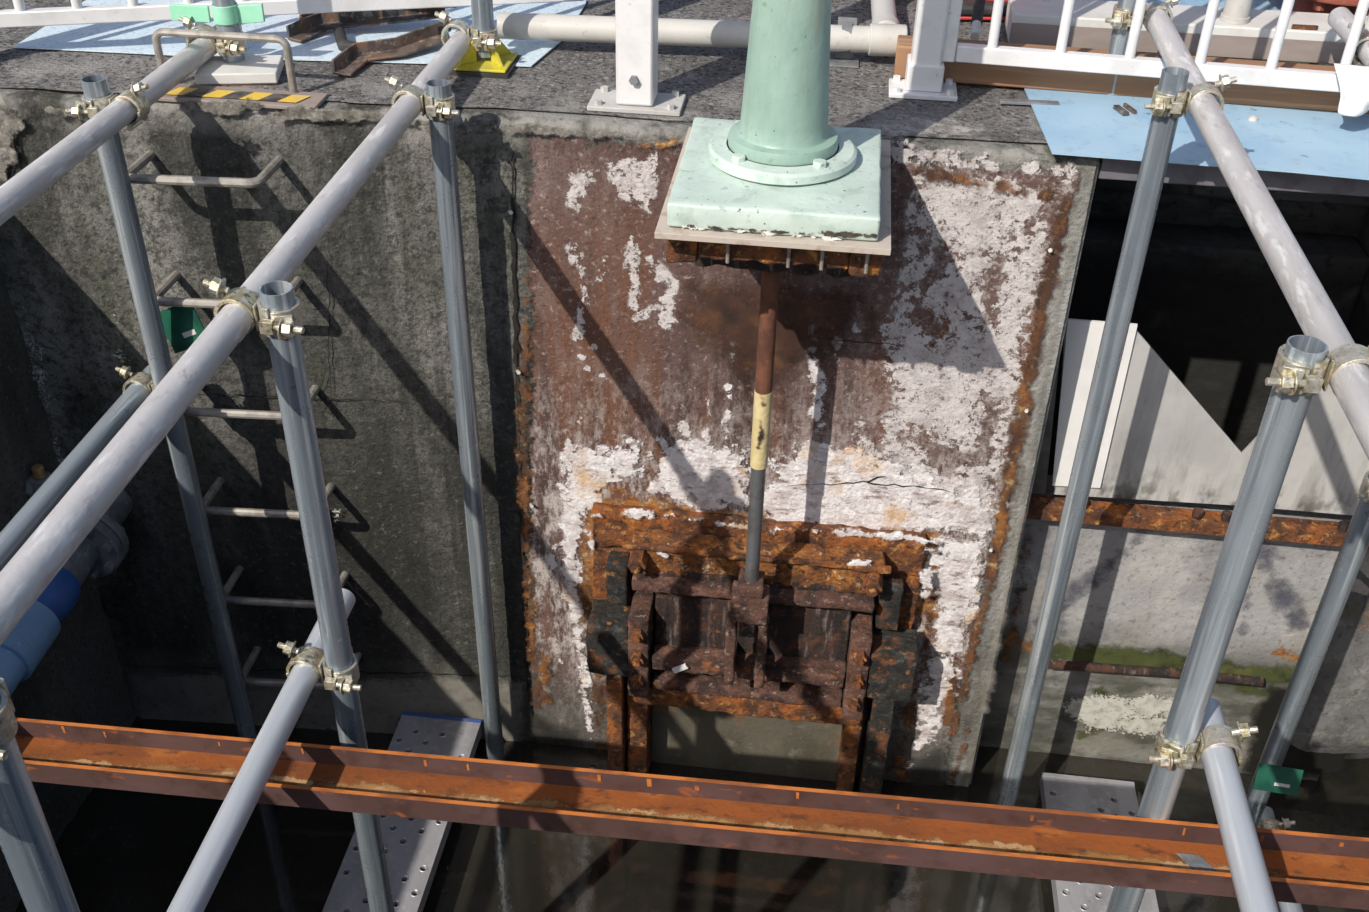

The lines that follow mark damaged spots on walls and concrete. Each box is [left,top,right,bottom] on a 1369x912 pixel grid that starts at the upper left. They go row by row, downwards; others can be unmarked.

damp [864,116,1002,173]
damp [1021,161,1078,185]
corrosion [574,487,774,640]
damp [499,337,1022,788]
corrosion [887,529,942,783]
damp [130,675,235,724]
damp [247,678,287,726]
damp [294,679,337,730]
damp [357,679,485,739]
corrosion [591,673,607,751]